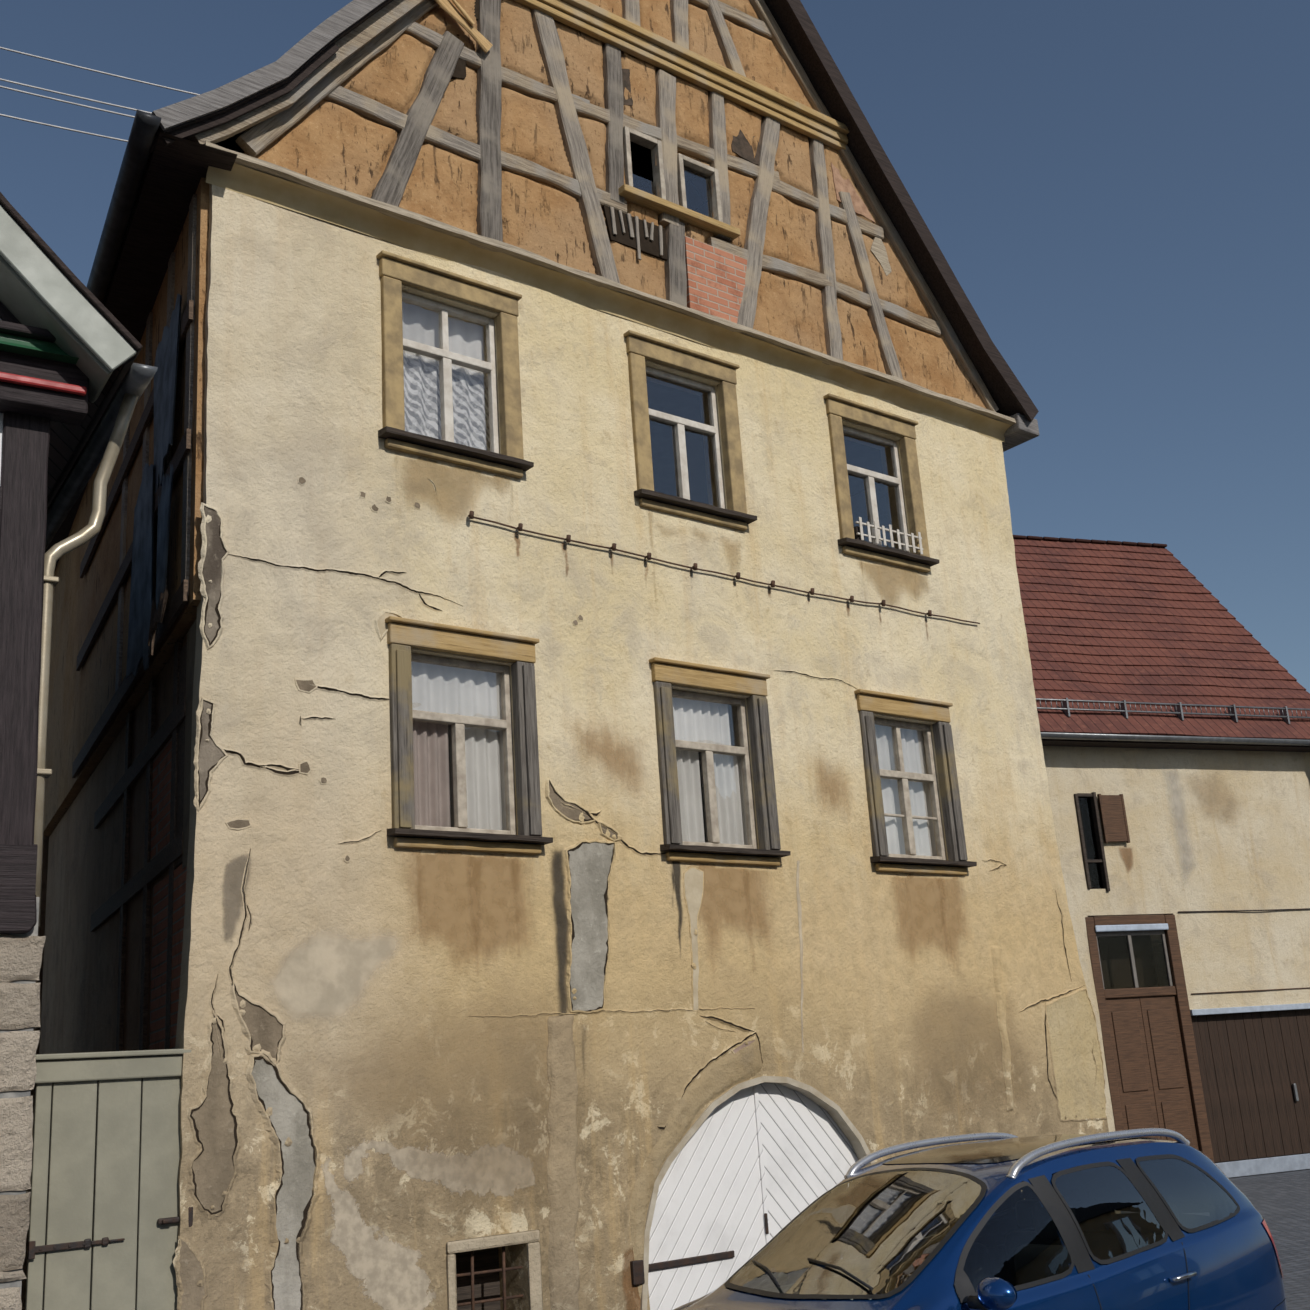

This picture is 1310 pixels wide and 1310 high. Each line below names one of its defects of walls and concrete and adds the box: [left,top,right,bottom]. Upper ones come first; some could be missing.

flaking render [198,502,229,650]
crack [228,553,463,612]
flaking render [193,698,228,812]
crack [223,748,300,777]
water stain [419,851,522,952]
flaking render [545,777,623,1015]
flaking render [683,867,704,1011]
crack [469,1007,764,1131]
flaking render [187,979,321,1310]
flaking render [173,1236,208,1310]